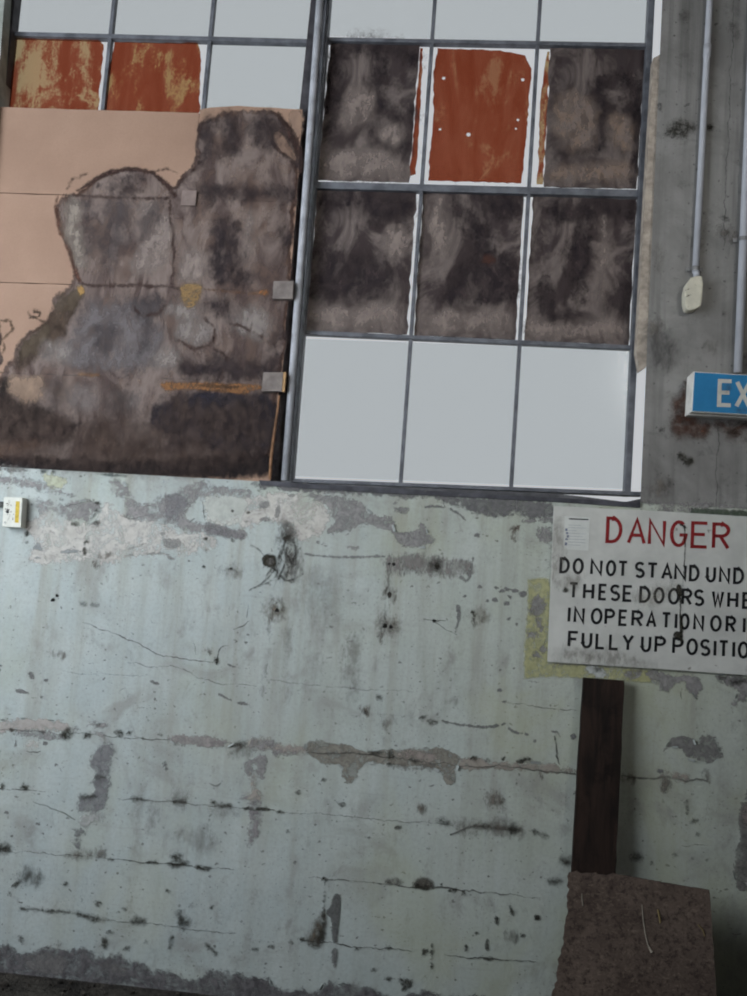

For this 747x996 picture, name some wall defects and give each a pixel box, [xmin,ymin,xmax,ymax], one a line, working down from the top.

flaking render [0,464,553,568]
crack [93,625,247,705]
peeling [645,670,702,699]
peeling [716,673,747,706]
spalling [0,717,71,740]
peeling [663,735,724,763]
peeling [733,794,747,891]